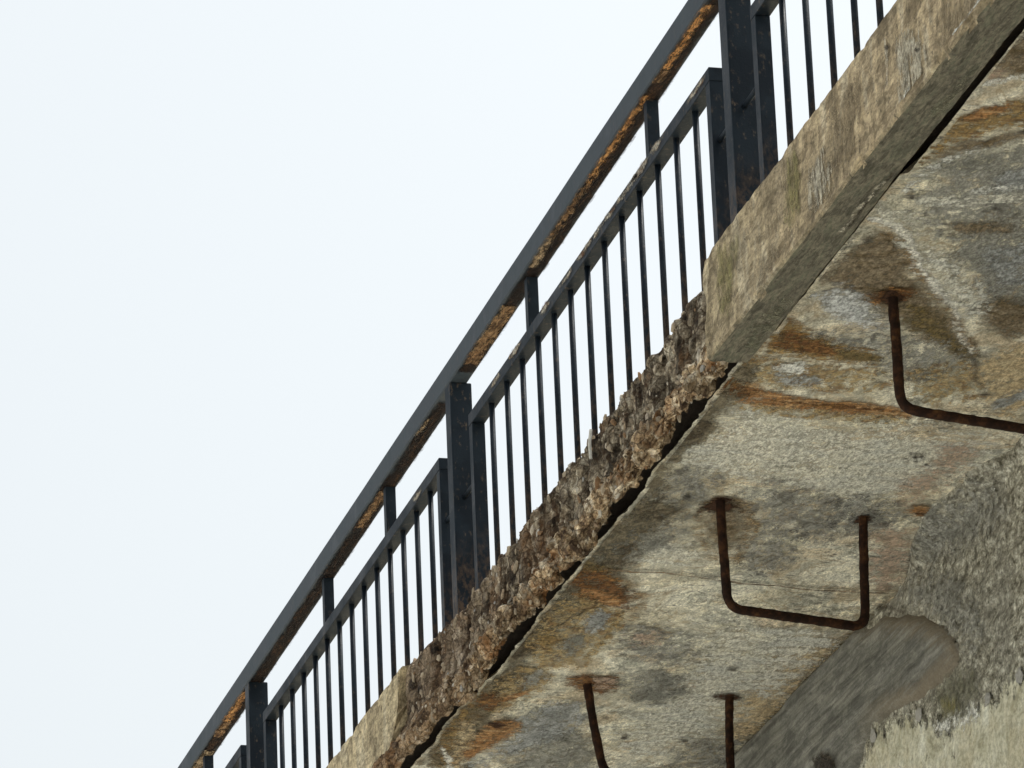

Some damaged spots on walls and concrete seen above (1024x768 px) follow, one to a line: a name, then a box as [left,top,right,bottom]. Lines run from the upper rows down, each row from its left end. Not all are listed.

corrosion [755,318,882,369]
corrosion [865,287,917,307]
corrosion [967,343,1024,418]
spalling [372,291,728,768]
water stain [416,139,1024,768]
corrosion [697,498,744,513]
corrosion [451,558,651,768]
corrosion [711,633,851,741]